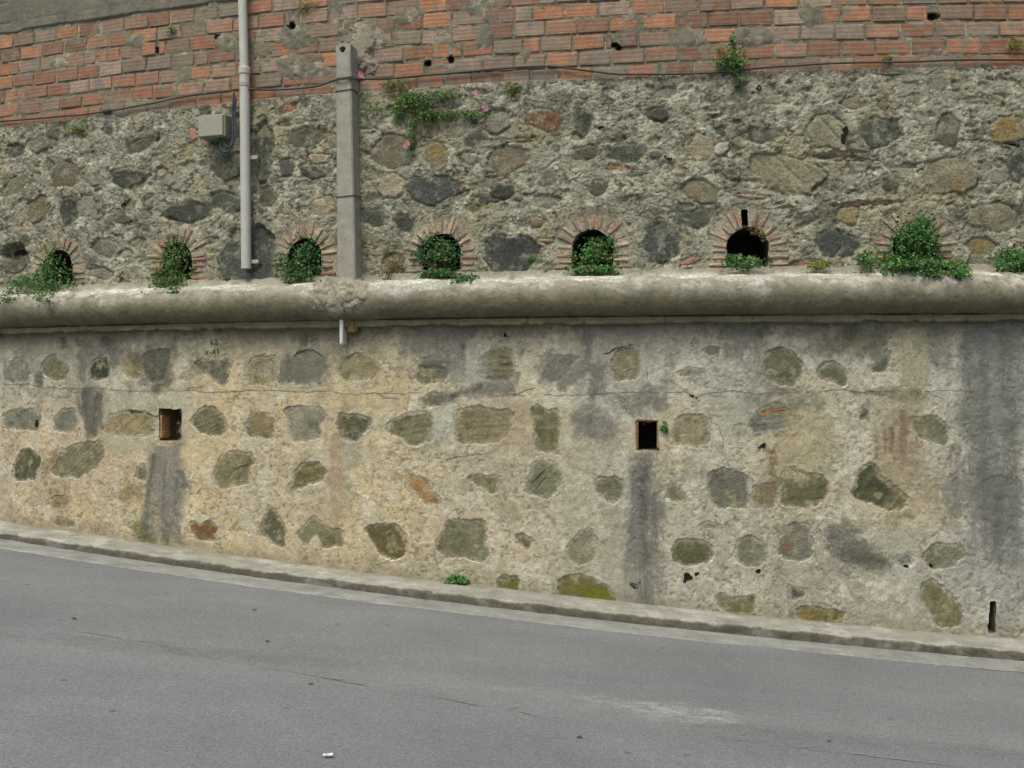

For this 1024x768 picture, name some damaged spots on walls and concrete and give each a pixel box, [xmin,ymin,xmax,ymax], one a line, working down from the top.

water stain [62,337,188,545]
water stain [624,454,665,605]
crack [494,353,1023,452]
water stain [944,326,1024,565]